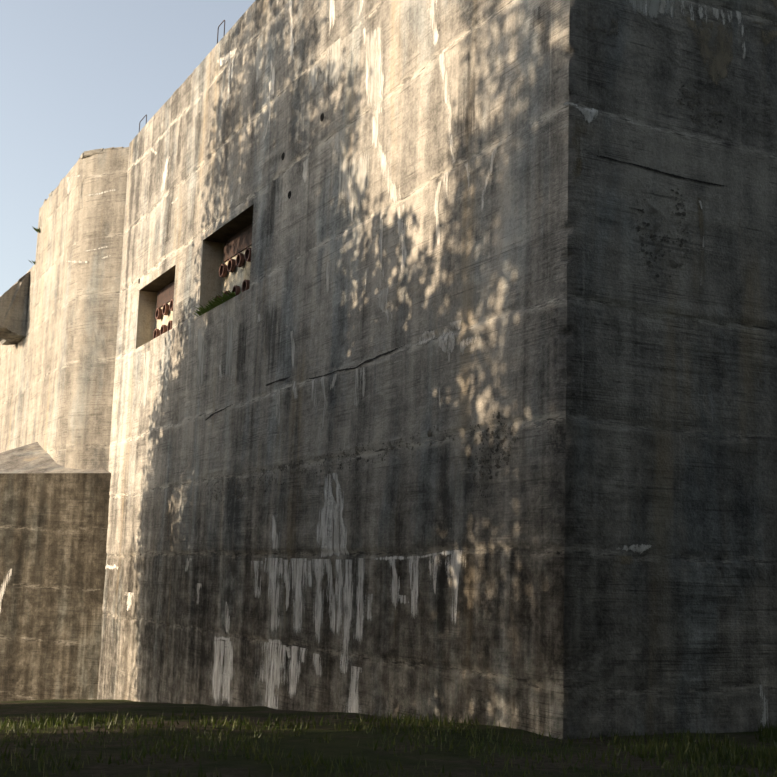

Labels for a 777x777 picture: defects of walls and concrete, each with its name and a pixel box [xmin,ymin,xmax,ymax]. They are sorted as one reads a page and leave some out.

leakage [626,0,746,59]
leakage [426,0,475,245]
crack [595,155,727,187]
crack [266,344,405,386]
leakage [0,569,12,612]
leakage [251,467,373,713]
leakage [373,550,466,624]
leakage [209,602,235,704]